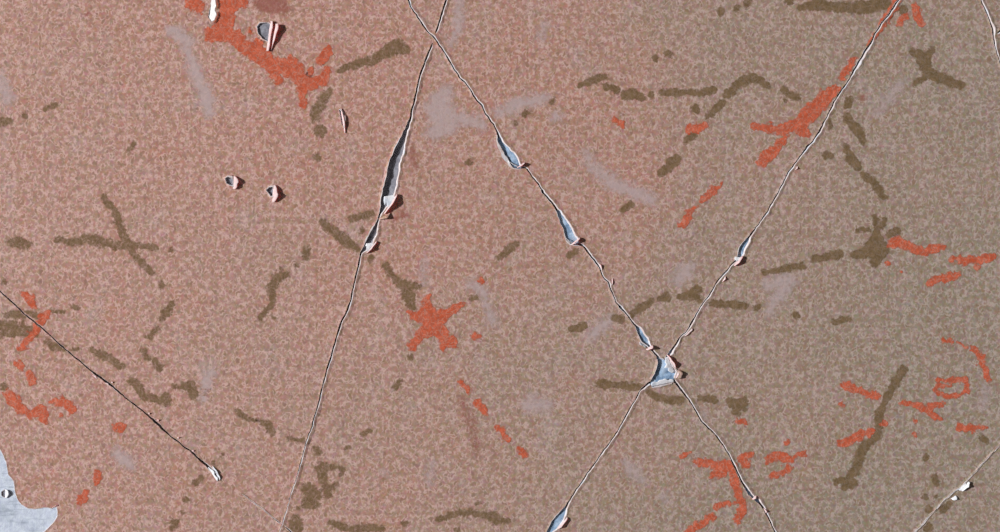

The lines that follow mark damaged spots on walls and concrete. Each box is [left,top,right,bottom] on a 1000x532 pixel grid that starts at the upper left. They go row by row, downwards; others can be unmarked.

flaking render [256,21,272,43]
leakage [909,48,965,90]
flaking render [223,174,234,188]
leakage [54,194,173,288]
crack [240,0,904,532]
leakage [568,214,997,341]
crack [0,289,224,482]
leakage [834,365,970,491]
peeling [0,448,59,532]
crack [912,443,1000,532]